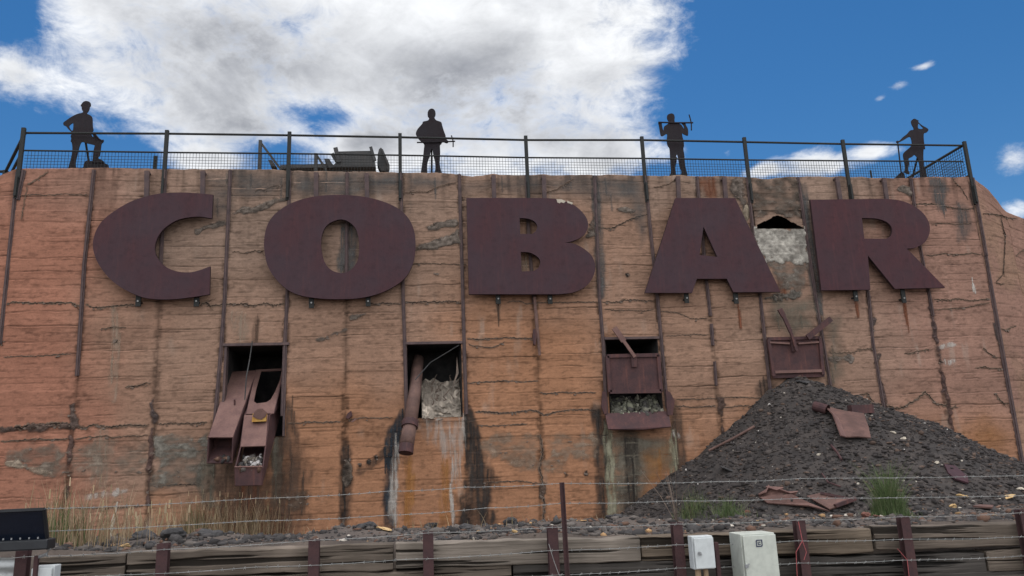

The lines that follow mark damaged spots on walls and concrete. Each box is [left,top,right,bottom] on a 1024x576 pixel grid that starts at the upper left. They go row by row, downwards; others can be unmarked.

peeling [730,177,809,265]
crack [916,178,1024,311]
crack [467,335,532,349]
crack [1,421,207,443]
leakage [340,445,360,521]
leakage [372,409,404,529]
leakage [449,408,495,525]
crack [859,391,958,410]